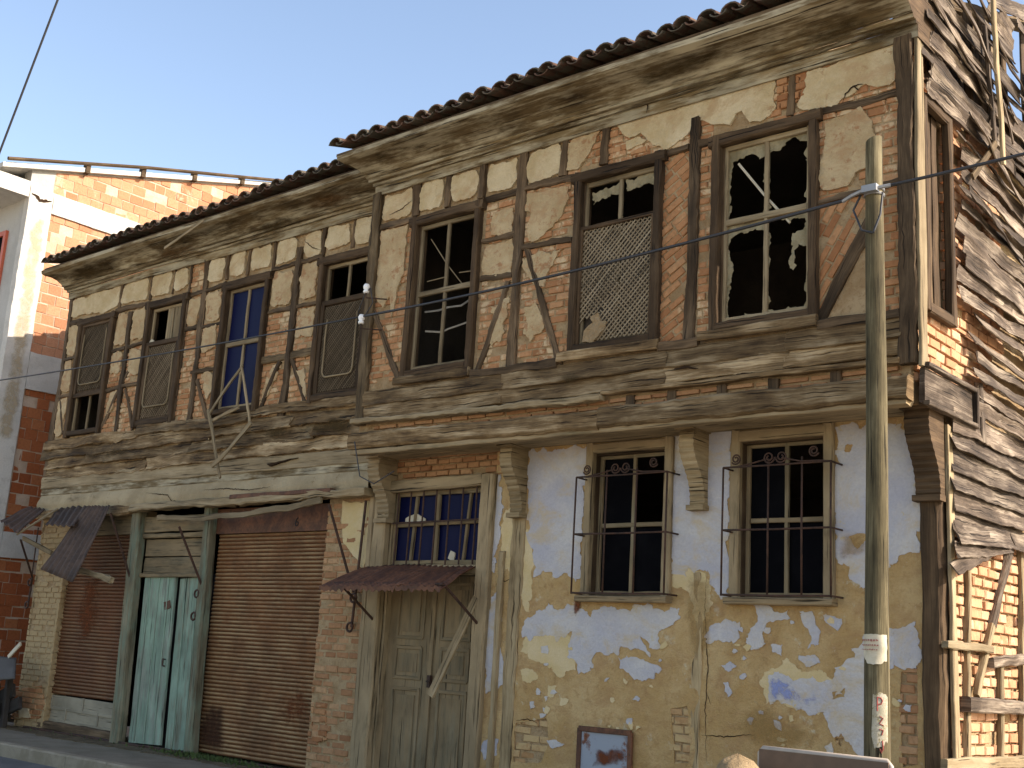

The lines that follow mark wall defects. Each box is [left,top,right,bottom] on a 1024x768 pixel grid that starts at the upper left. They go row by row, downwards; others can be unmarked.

water stain [645,53,714,84]
spalling [777,71,807,110]
peeling [888,423,921,568]
peeling [481,739,499,760]
peeling [512,422,866,764]
crack [702,578,753,749]
spalling [889,622,922,767]